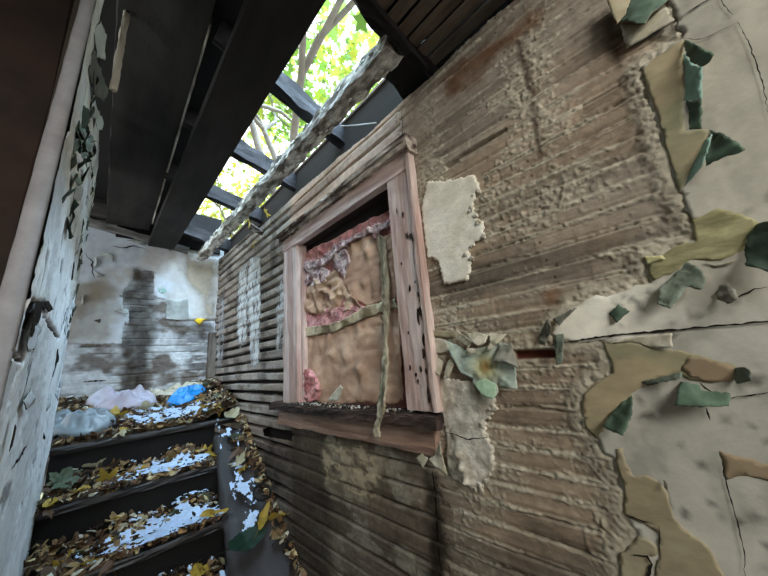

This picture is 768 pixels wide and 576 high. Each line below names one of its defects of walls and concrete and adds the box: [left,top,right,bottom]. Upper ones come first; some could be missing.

crack [627,0,768,112]
peeling [62,20,148,339]
spalling [421,175,490,284]
peeling [46,349,63,412]
leakage [120,269,156,391]
leakage [186,258,224,370]
leakage [237,257,261,365]
peeling [609,304,630,323]
crack [544,321,768,346]
leakage [322,444,381,497]
peeling [619,537,658,576]
crack [719,451,746,576]